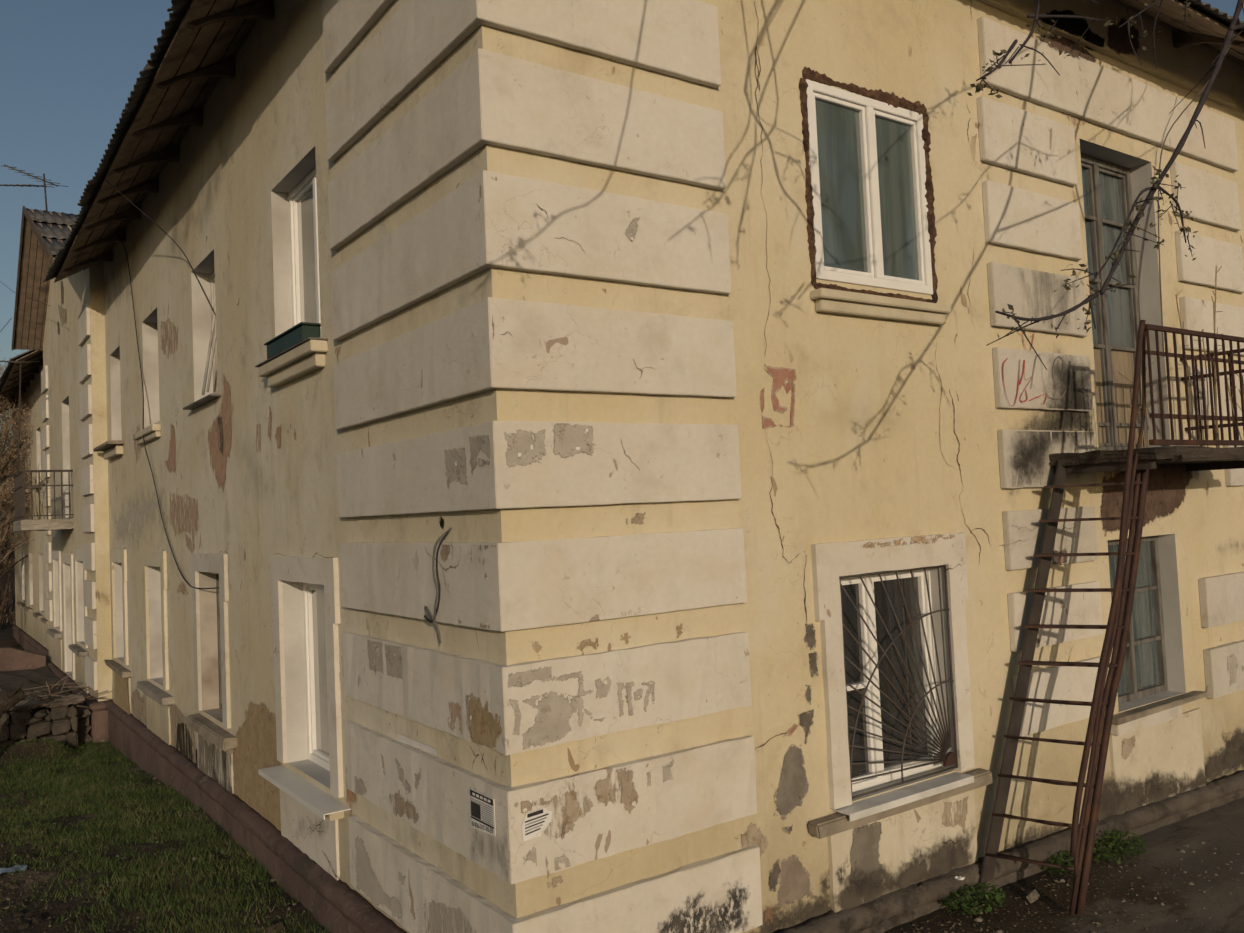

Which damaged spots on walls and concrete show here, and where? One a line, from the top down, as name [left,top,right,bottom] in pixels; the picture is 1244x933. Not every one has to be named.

crack [754,1,771,353]
spalling [799,67,938,303]
crack [765,430,807,620]
crack [935,337,1074,570]
water stain [1013,362,1090,475]
spalling [1100,464,1199,532]
peeling [233,702,282,831]
peeling [448,641,655,751]
peeling [515,761,674,839]
spalling [774,623,819,834]
water stain [1098,729,1244,822]
water stain [660,837,972,933]